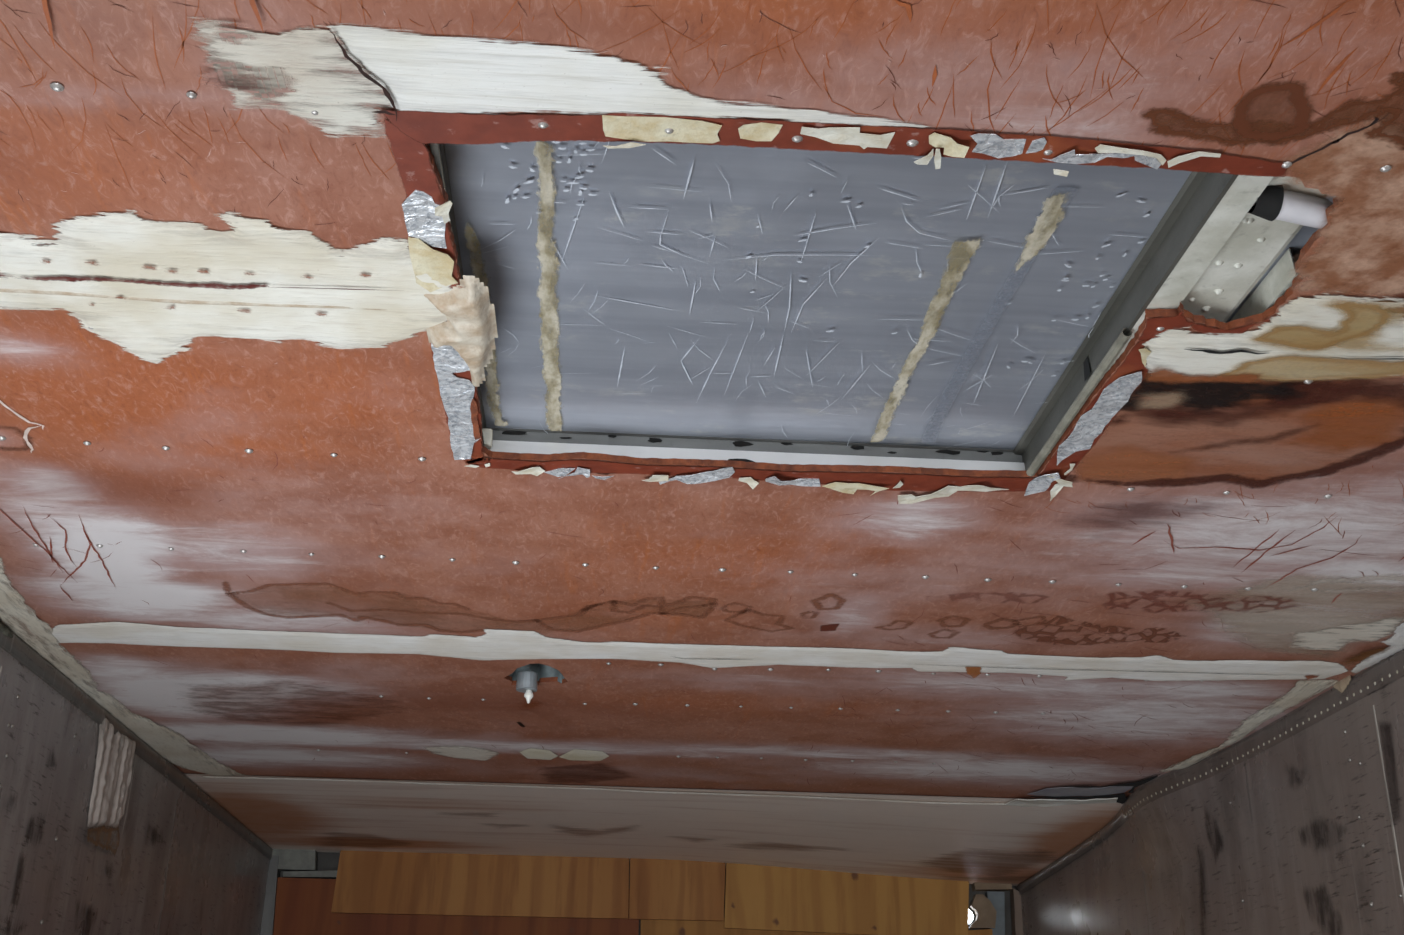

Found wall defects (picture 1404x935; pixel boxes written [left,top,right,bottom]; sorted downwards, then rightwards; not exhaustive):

peeling [194,21,391,138]
peeling [602,115,783,149]
peeling [800,127,895,149]
peeling [914,132,1221,177]
damp [1076,73,1404,488]
peeling [512,467,613,480]
peeling [642,467,1009,504]
damp [223,582,845,633]
peeling [1291,619,1404,674]